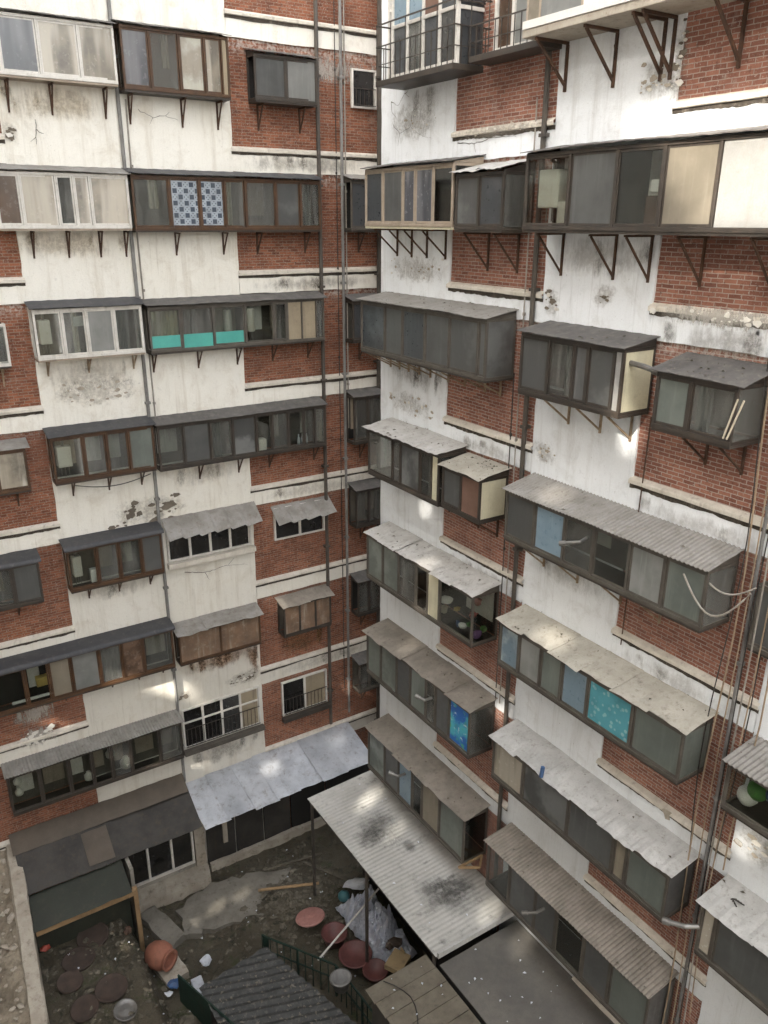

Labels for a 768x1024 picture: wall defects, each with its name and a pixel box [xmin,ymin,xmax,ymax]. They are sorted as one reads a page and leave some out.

peeling [640,18,689,94]
peeling [649,306,767,332]
peeling [108,493,180,530]